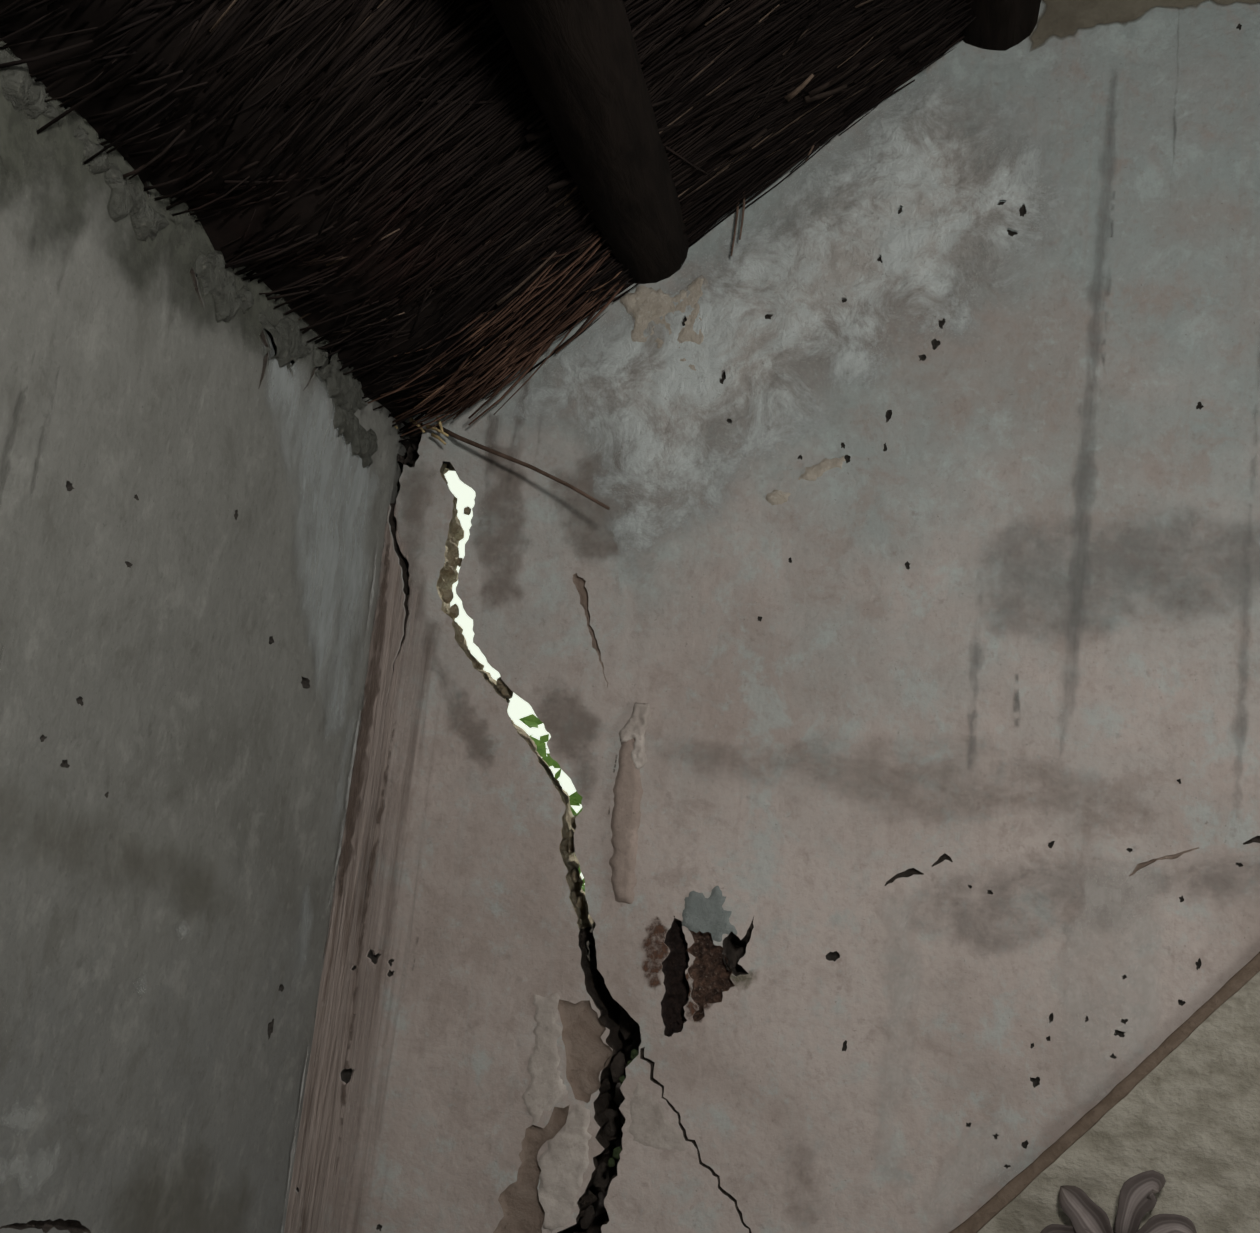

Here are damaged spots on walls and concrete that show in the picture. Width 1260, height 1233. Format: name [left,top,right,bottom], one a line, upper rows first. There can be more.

peeling [1030,0,1260,50]
crack [389,422,751,1233]
spalling [661,886,754,1037]
spalling [826,951,840,962]
spalling [493,993,613,1233]
crack [0,1219,91,1233]